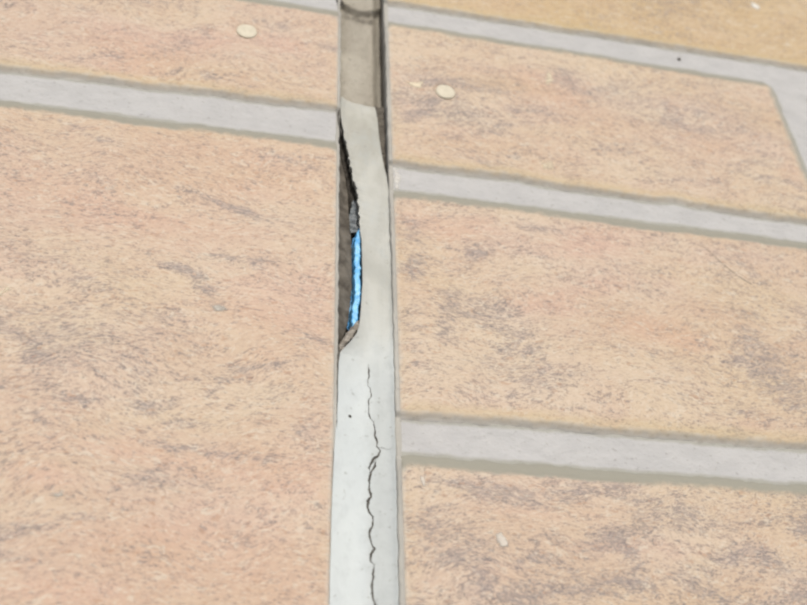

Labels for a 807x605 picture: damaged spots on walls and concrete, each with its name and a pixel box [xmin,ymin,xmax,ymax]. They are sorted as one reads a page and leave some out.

crack [366,364,392,605]